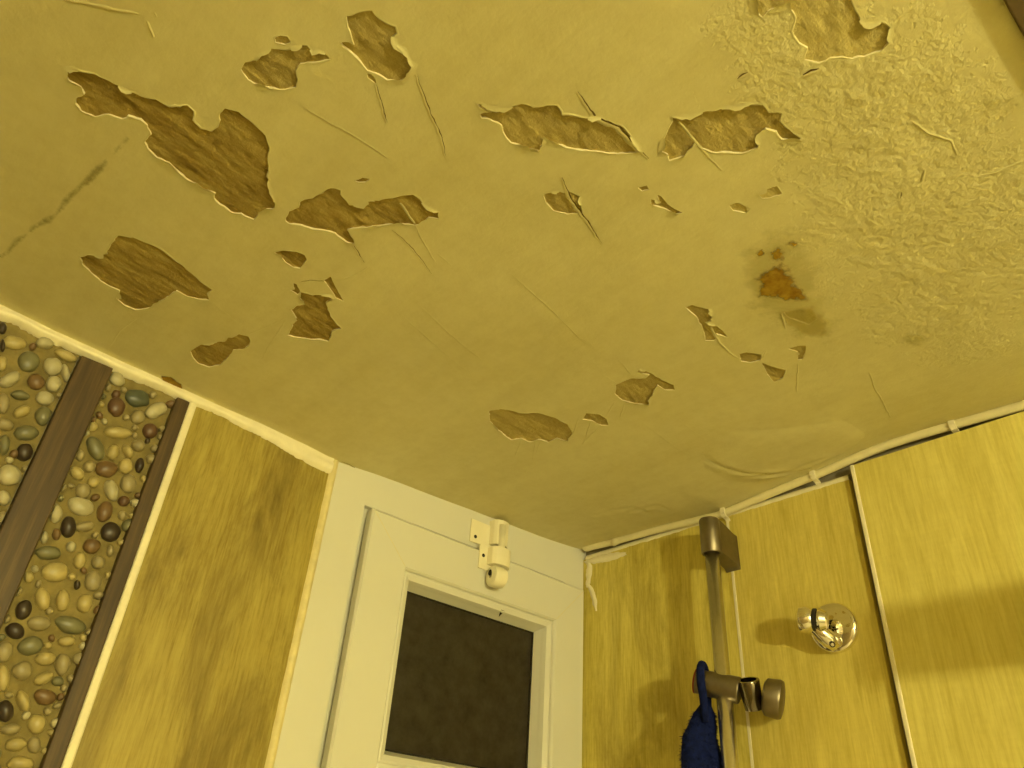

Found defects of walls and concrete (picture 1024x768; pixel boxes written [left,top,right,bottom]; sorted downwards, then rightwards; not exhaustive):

peeling [240,34,333,91]
peeling [340,9,446,157]
spalling [749,0,894,77]
peeling [475,92,805,171]
peeling [61,65,440,368]
corrosion [757,242,805,300]
peeling [685,304,807,392]
peeling [488,360,675,459]